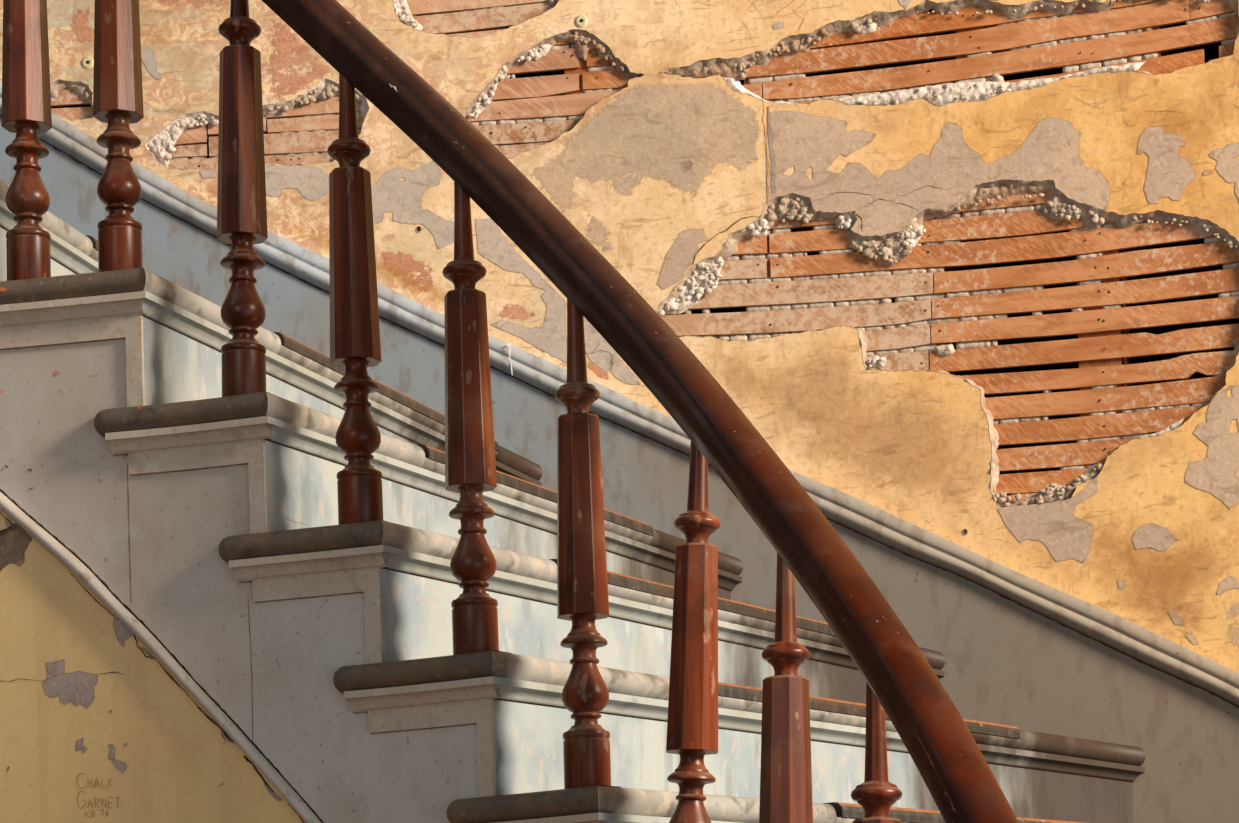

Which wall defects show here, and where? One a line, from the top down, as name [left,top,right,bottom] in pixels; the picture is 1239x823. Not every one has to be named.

spalling [393,0,559,38]
spalling [145,111,219,179]
spalling [263,21,339,201]
spalling [355,90,369,135]
spalling [463,0,1239,563]
spalling [0,517,33,571]
peeling [1217,576,1239,647]
peeling [43,659,97,708]